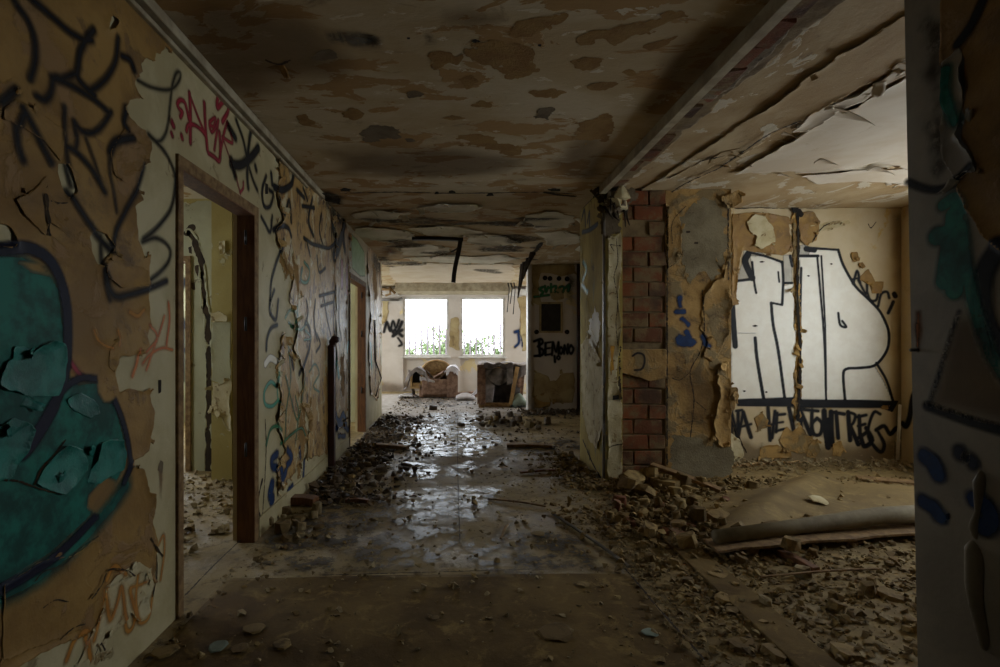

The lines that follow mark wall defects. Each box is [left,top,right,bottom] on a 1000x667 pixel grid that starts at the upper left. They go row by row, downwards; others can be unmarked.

peeling [0,0,173,667]
crack [184,224,211,471]
crack [259,419,267,516]
flaking render [331,108,415,142]
peeling [265,156,522,496]
flaking render [456,134,522,156]
flaking render [427,13,569,80]
peeling [515,0,908,480]
crack [648,121,801,465]
crack [727,207,834,421]